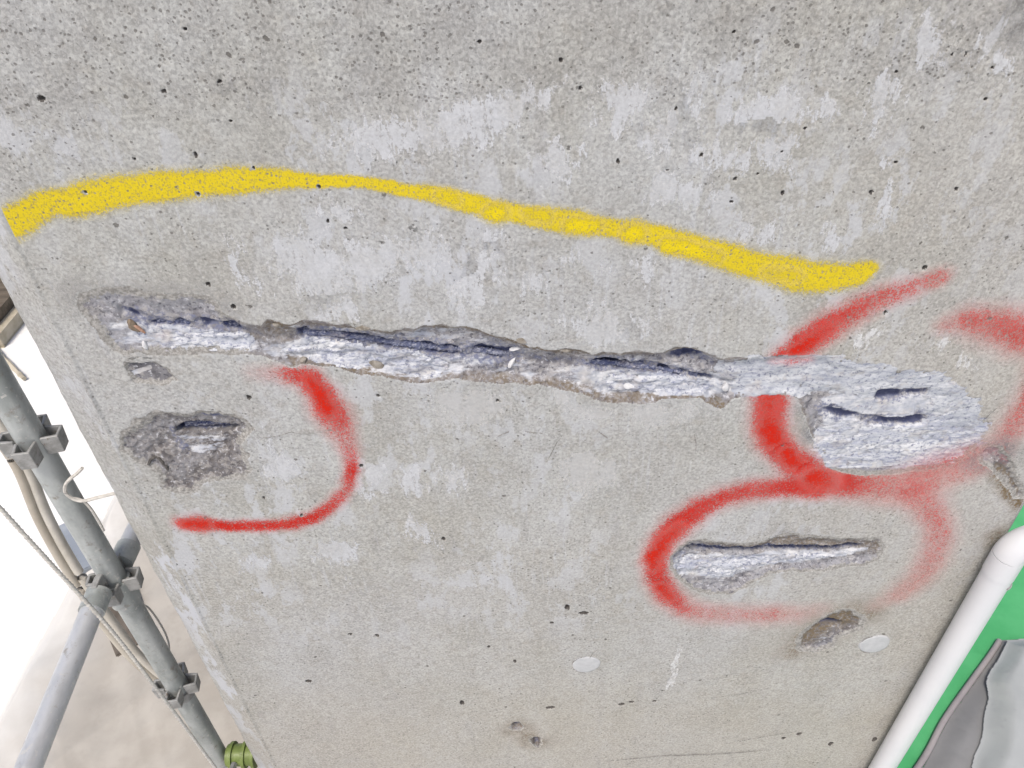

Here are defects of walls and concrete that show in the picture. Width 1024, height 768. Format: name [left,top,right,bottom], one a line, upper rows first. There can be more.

peeling [528,135,589,185]
peeling [877,153,894,232]
spalling [68,197,1024,502]
spalling [662,528,890,598]
spalling [789,607,874,656]